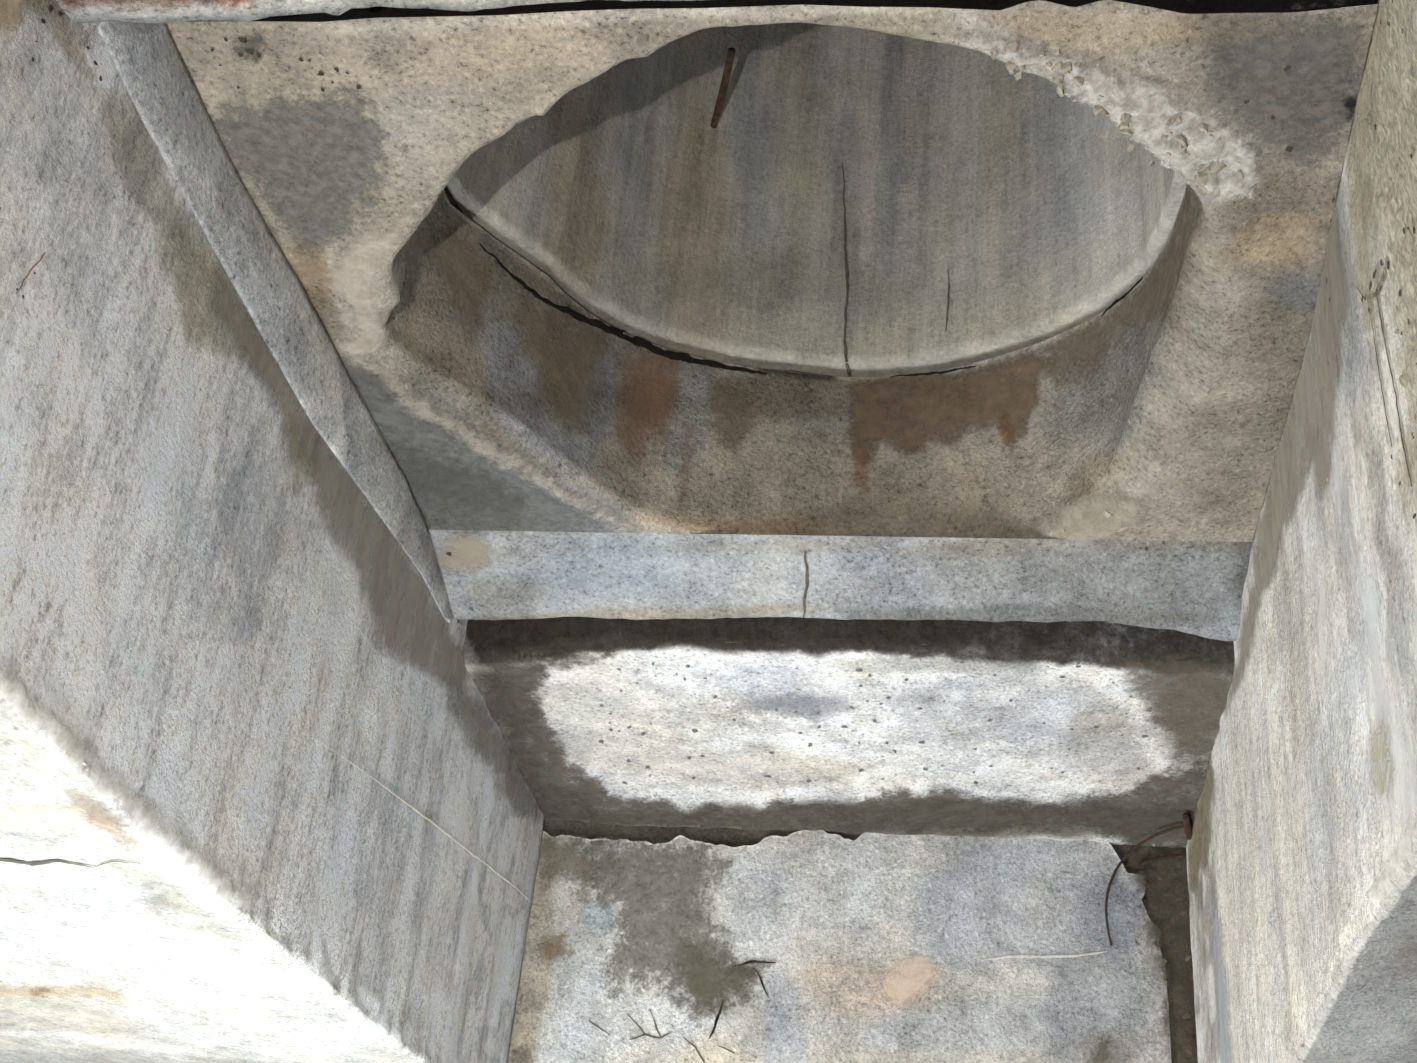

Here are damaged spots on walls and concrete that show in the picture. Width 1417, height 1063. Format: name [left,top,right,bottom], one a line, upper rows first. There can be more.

corrosion [63,0,239,11]
leakage [210,34,267,66]
spalling [965,33,1259,204]
leakage [214,51,390,254]
crack [801,551,809,618]
leakage [216,193,1344,1063]
crack [0,859,140,868]